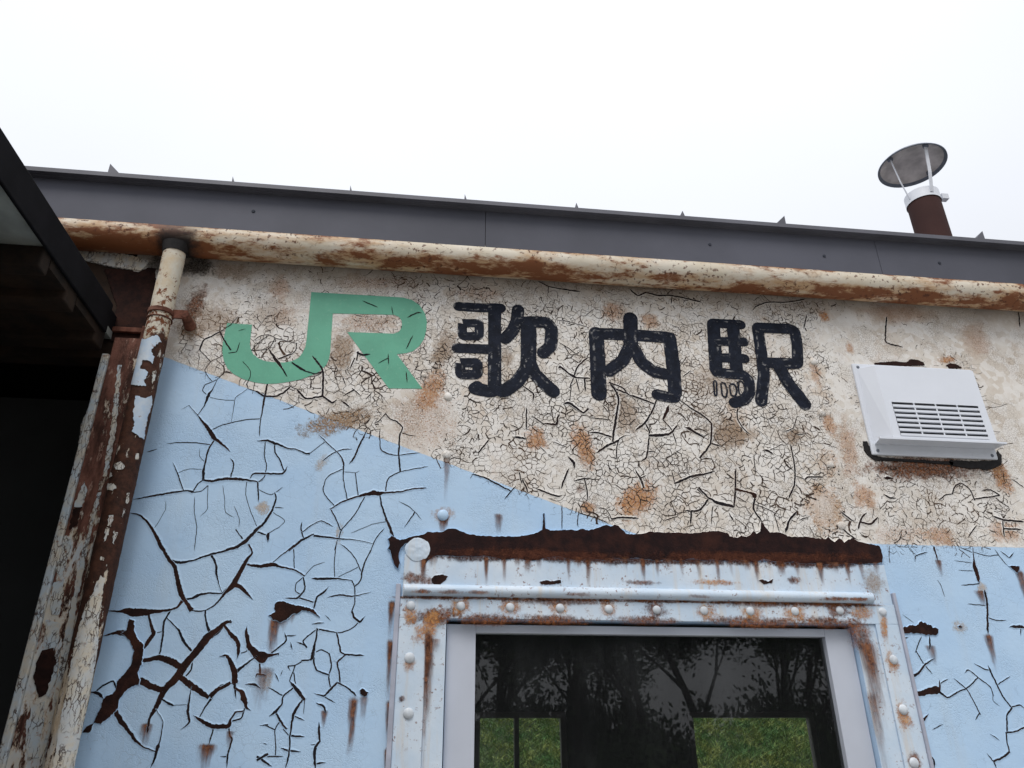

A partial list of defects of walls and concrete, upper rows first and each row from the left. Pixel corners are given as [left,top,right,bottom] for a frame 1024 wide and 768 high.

rust [177,258,211,340]
rust [569,428,593,464]
peeling [25,251,161,768]
crack [82,262,1024,768]
rust [615,481,656,521]
peeling [387,513,883,569]
rust [270,620,279,646]
peeling [269,601,320,623]
rust [389,548,898,718]
peeling [903,620,939,637]
rust [349,698,366,740]
rust [200,744,214,759]